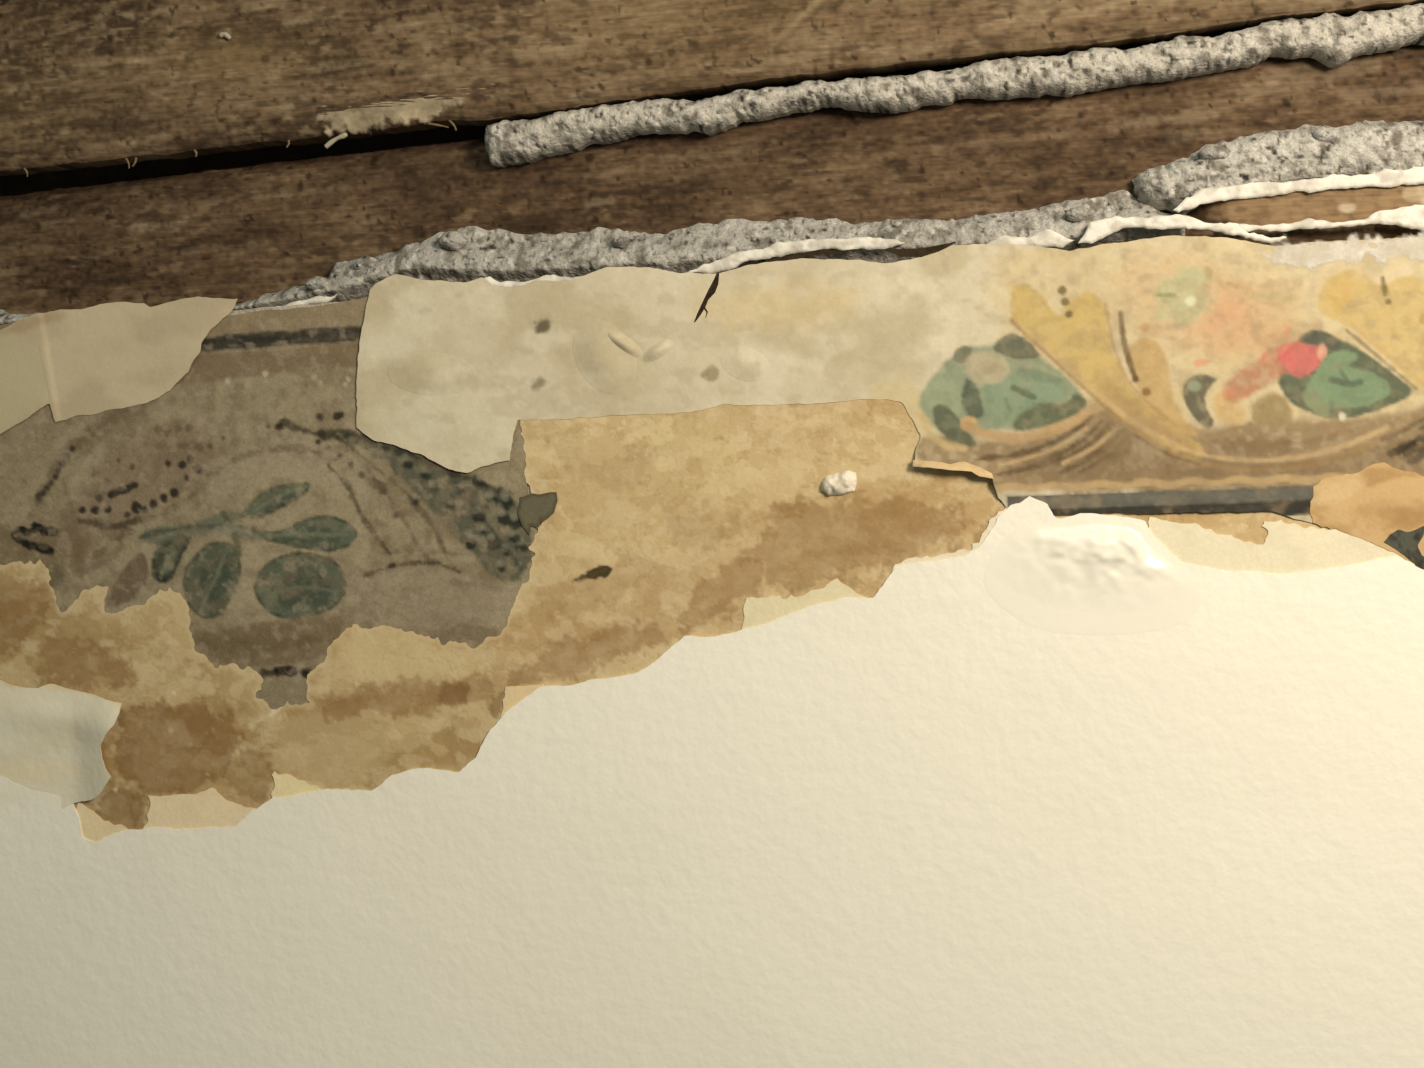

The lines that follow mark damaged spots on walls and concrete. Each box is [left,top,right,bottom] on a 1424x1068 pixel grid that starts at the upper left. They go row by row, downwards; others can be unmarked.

spalling [234,120,1424,310]
spalling [0,310,39,325]
crack [694,273,719,323]
peeling [1310,462,1424,570]
water stain [575,566,612,580]
peeling [0,680,122,809]